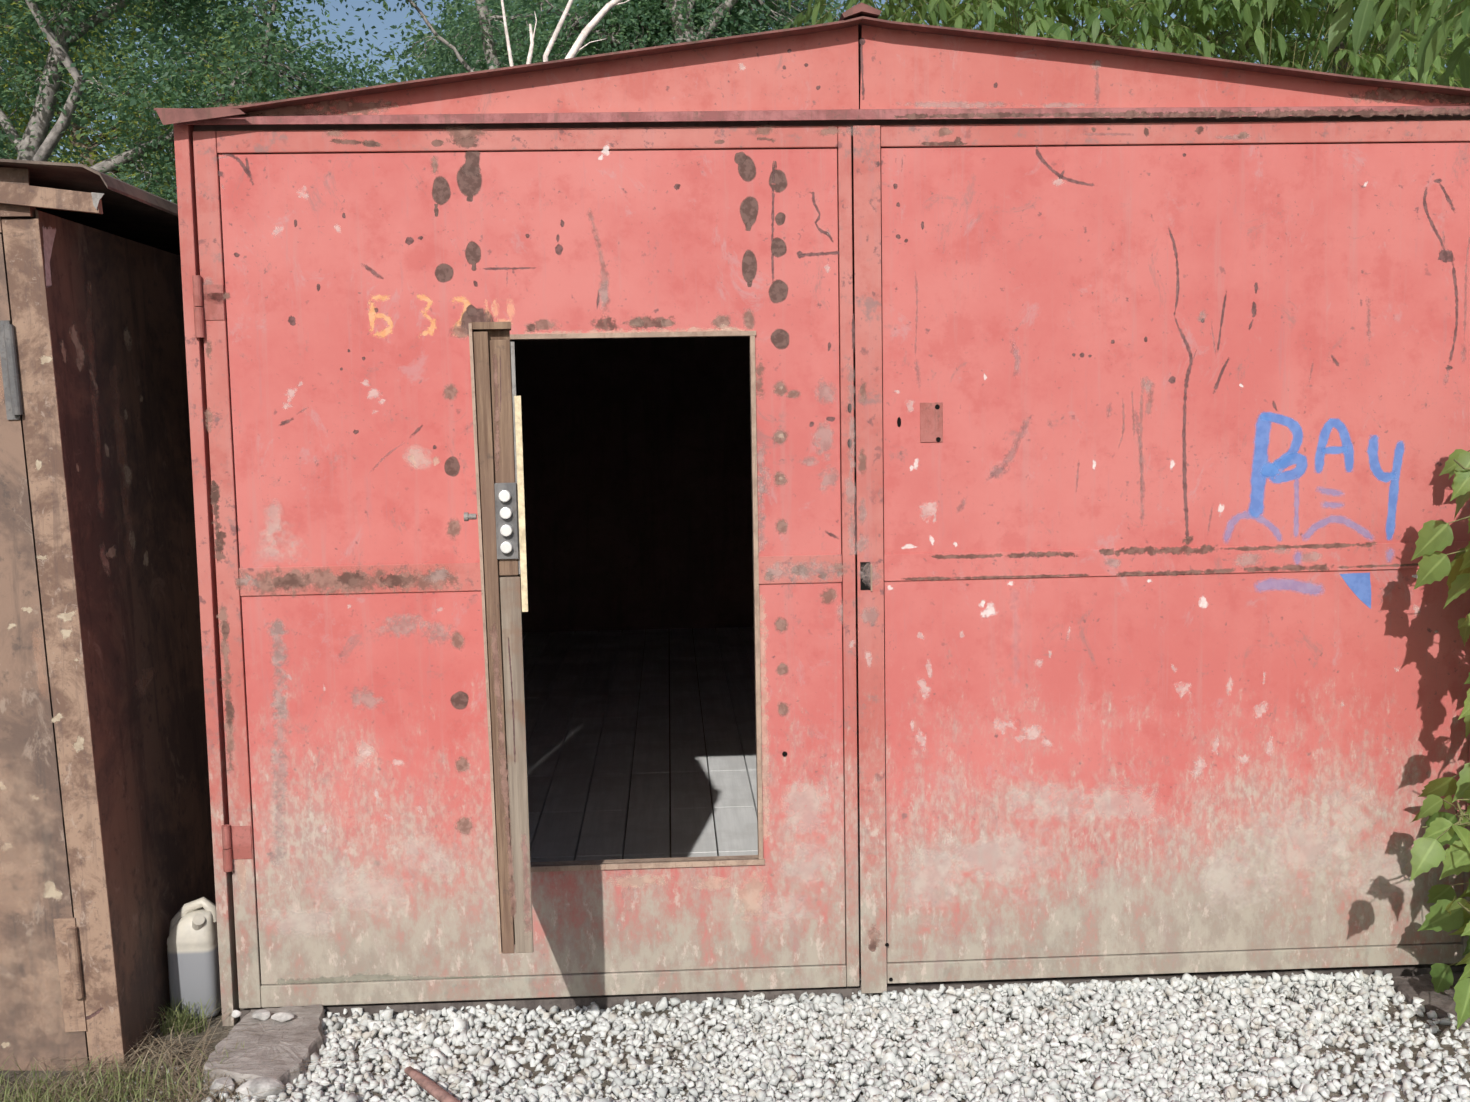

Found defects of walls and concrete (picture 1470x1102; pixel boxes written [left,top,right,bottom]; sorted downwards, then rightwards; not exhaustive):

rust [210,480,226,561]
rust [236,566,460,597]
rust [903,551,1088,581]
rust [1099,542,1419,577]
peeling [979,600,995,617]
peeling [918,662,932,697]
water stain [269,619,288,865]
peeling [995,722,1051,745]
water stain [1260,792,1410,899]